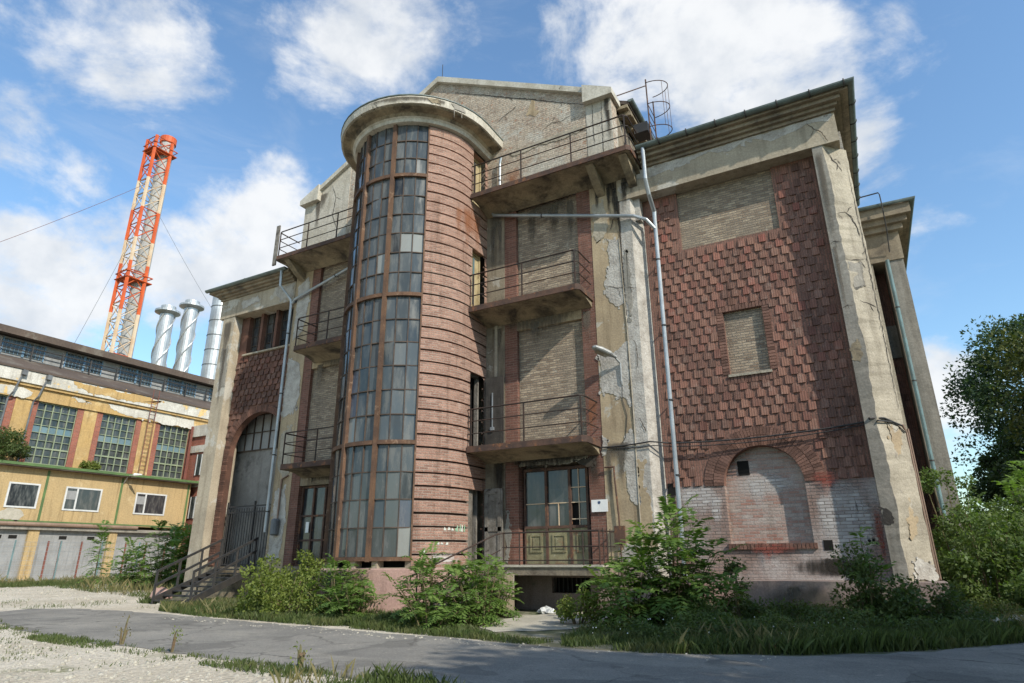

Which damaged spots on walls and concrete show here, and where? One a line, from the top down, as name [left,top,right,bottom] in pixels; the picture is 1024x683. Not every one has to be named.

crack [807,124,899,408]
peeling [0,384,33,398]
peeling [72,381,194,429]
peeling [595,341,632,407]
spalling [911,557,939,581]